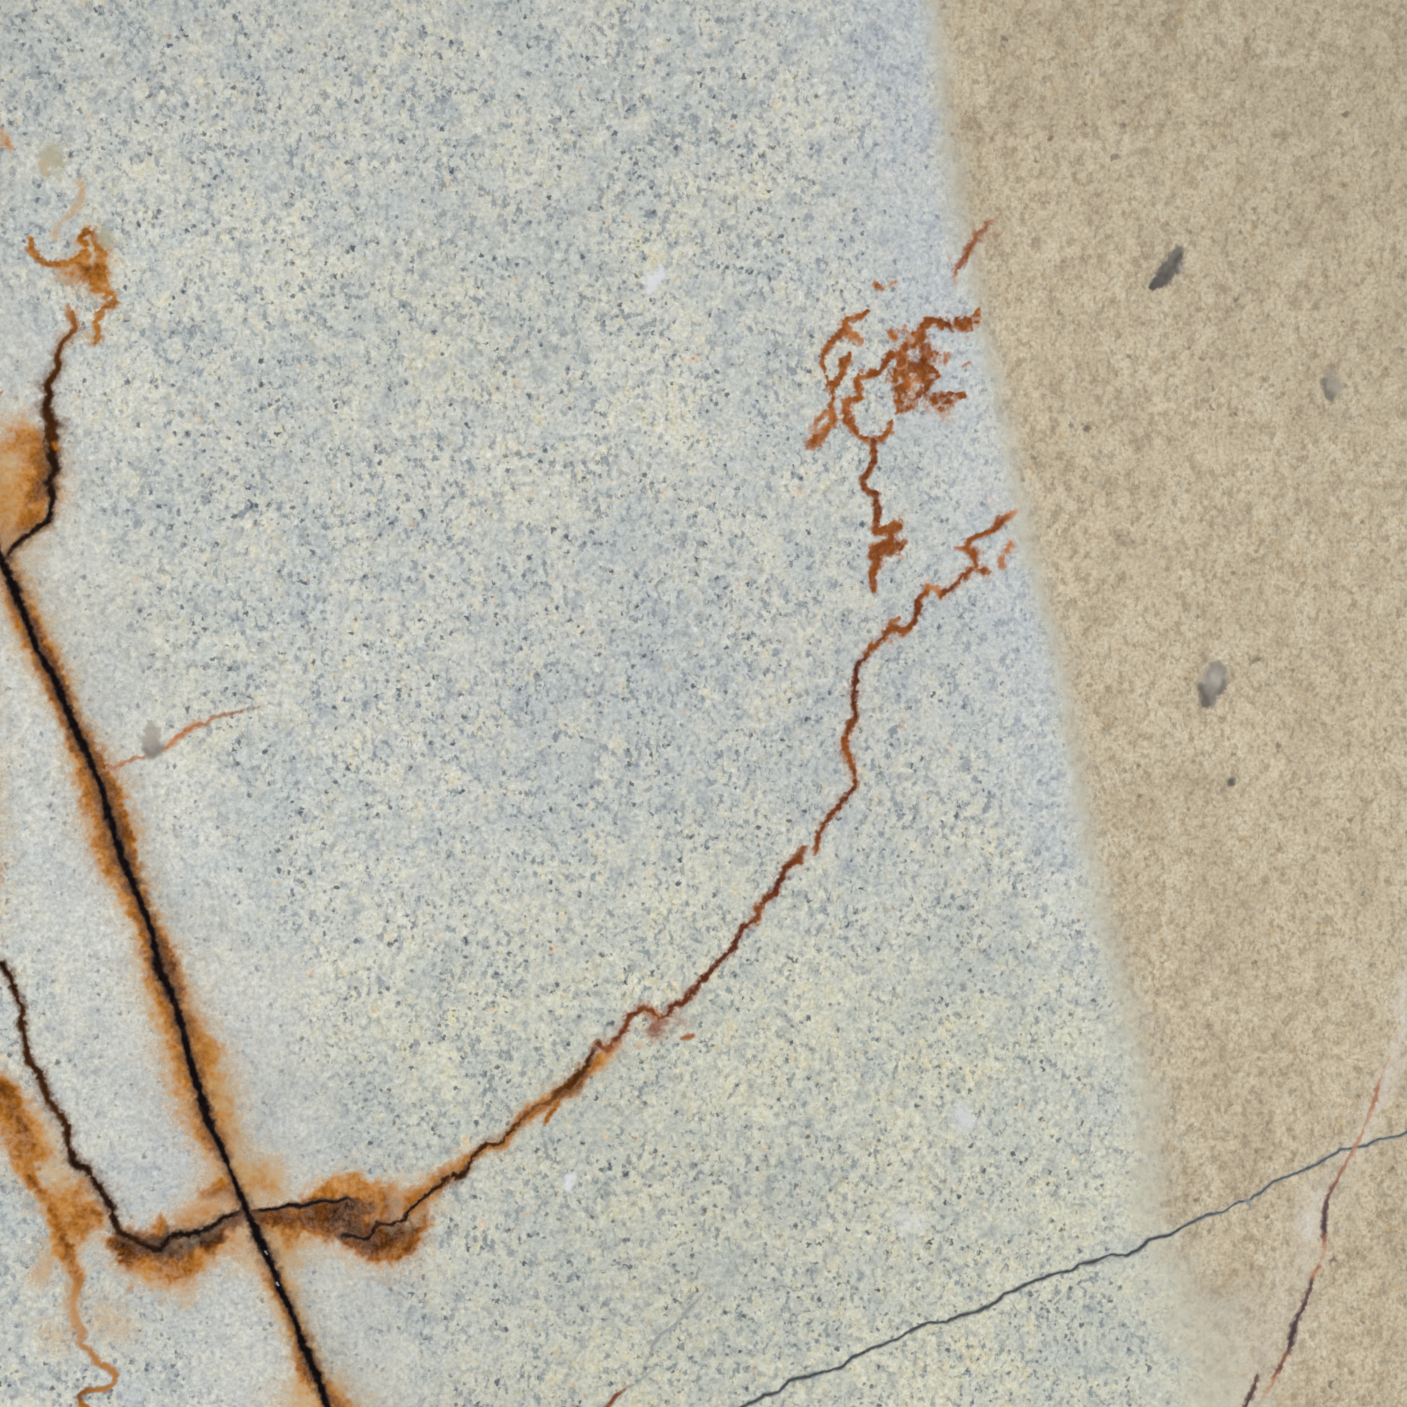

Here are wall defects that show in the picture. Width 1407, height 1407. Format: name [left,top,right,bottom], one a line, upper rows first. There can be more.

corrosion [0,130,14,151]
corrosion [24,182,120,346]
corrosion [953,220,994,278]
corrosion [805,307,981,593]
corrosion [0,416,695,1407]
crack [0,310,1017,1407]
water stain [929,0,1407,1407]
crack [739,1077,1407,1407]